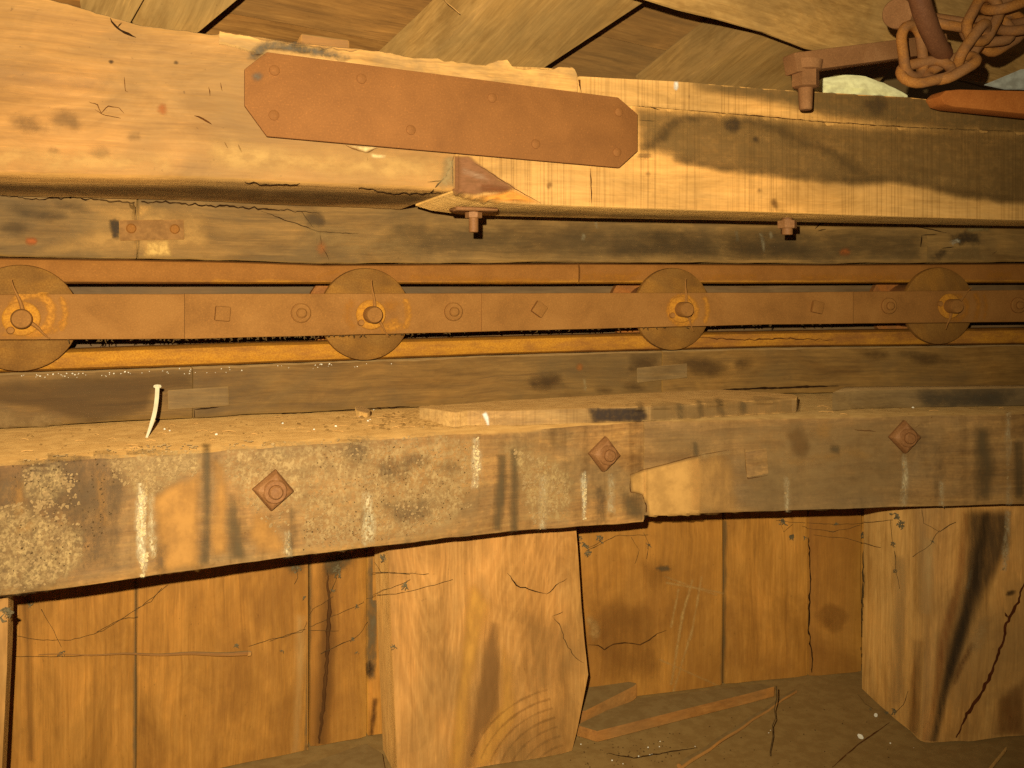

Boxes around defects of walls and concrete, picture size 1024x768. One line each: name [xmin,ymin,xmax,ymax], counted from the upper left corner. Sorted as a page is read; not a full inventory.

crack [6,182,358,259]
crack [358,157,454,195]
corrosion [11,292,68,337]
leakage [136,487,163,577]
leakage [496,452,516,530]
crack [318,572,332,744]
crack [507,573,666,663]
crack [806,538,814,673]
leakage [941,514,1010,684]
crack [956,584,1024,738]